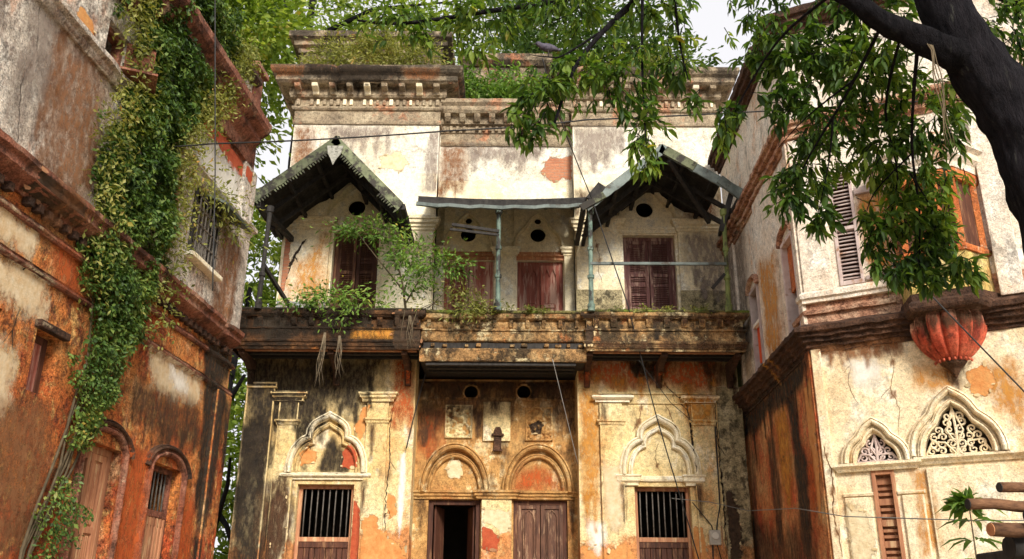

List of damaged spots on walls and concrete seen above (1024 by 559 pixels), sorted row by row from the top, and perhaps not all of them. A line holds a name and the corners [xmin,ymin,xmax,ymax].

flaking render [541,155,572,183]
crack [286,239,306,280]
leakage [132,235,385,559]
crack [845,346,900,432]
peeling [965,360,996,396]
peeling [299,446,317,466]
leakage [743,337,902,559]
peeling [481,507,512,552]